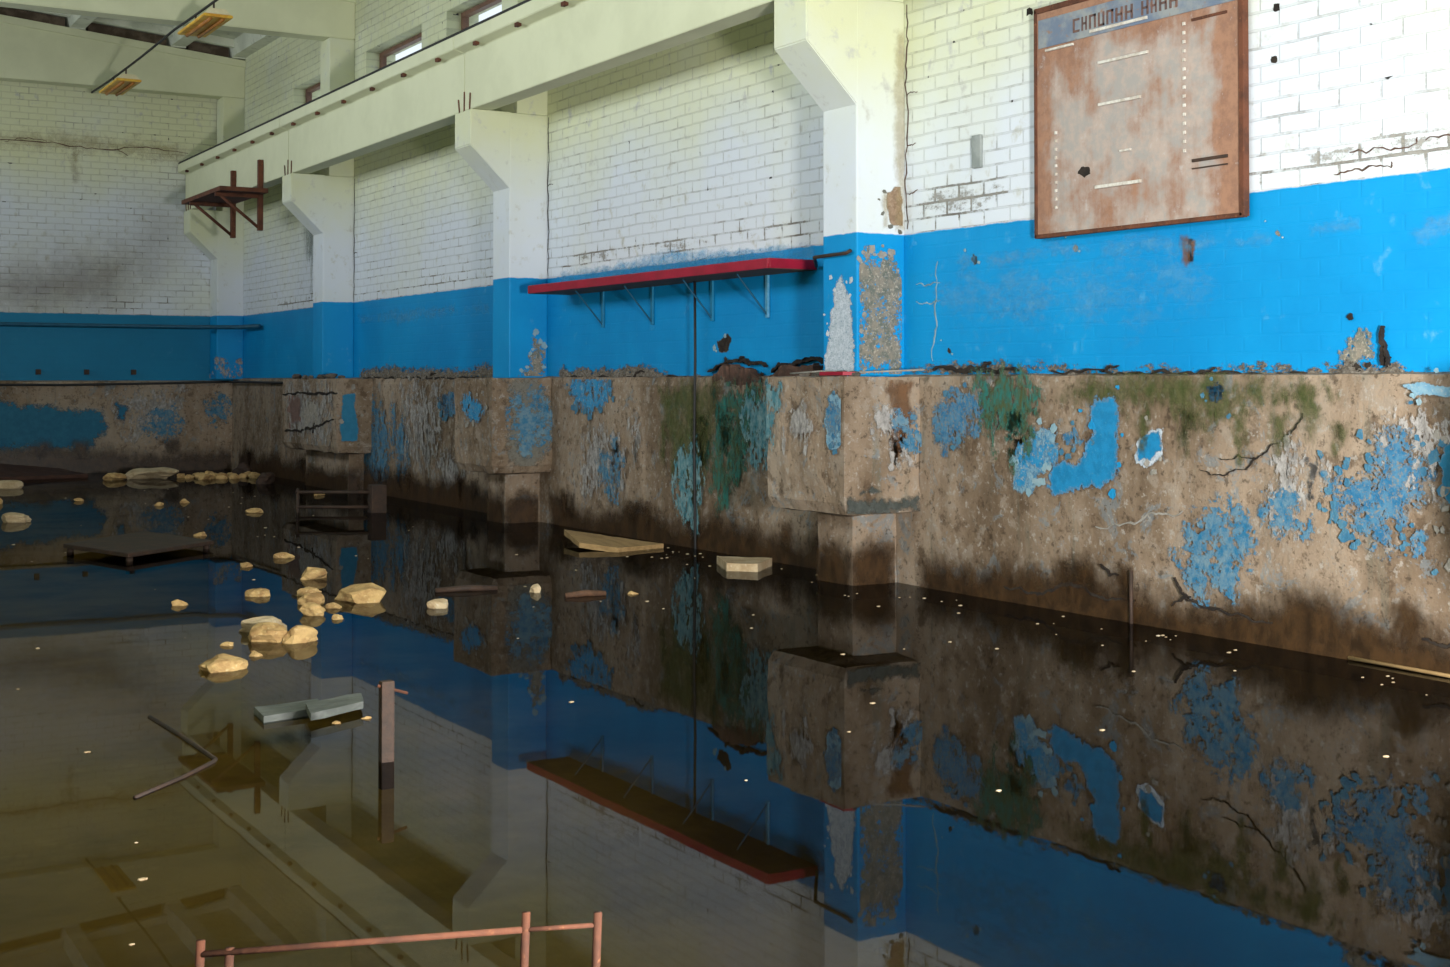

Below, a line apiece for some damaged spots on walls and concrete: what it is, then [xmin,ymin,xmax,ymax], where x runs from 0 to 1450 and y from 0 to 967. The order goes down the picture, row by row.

peeling [1284,129,1450,171]
peeling [566,220,808,265]
spalling [696,176,1431,499]
peeling [0,401,186,451]
peeling [337,328,668,483]
peeling [596,435,626,505]
peeling [671,435,705,534]
leakage [989,409,1032,476]
leakage [1140,410,1149,450]
crack [1200,413,1303,476]
peeling [1169,425,1450,607]
leakage [920,559,1450,698]